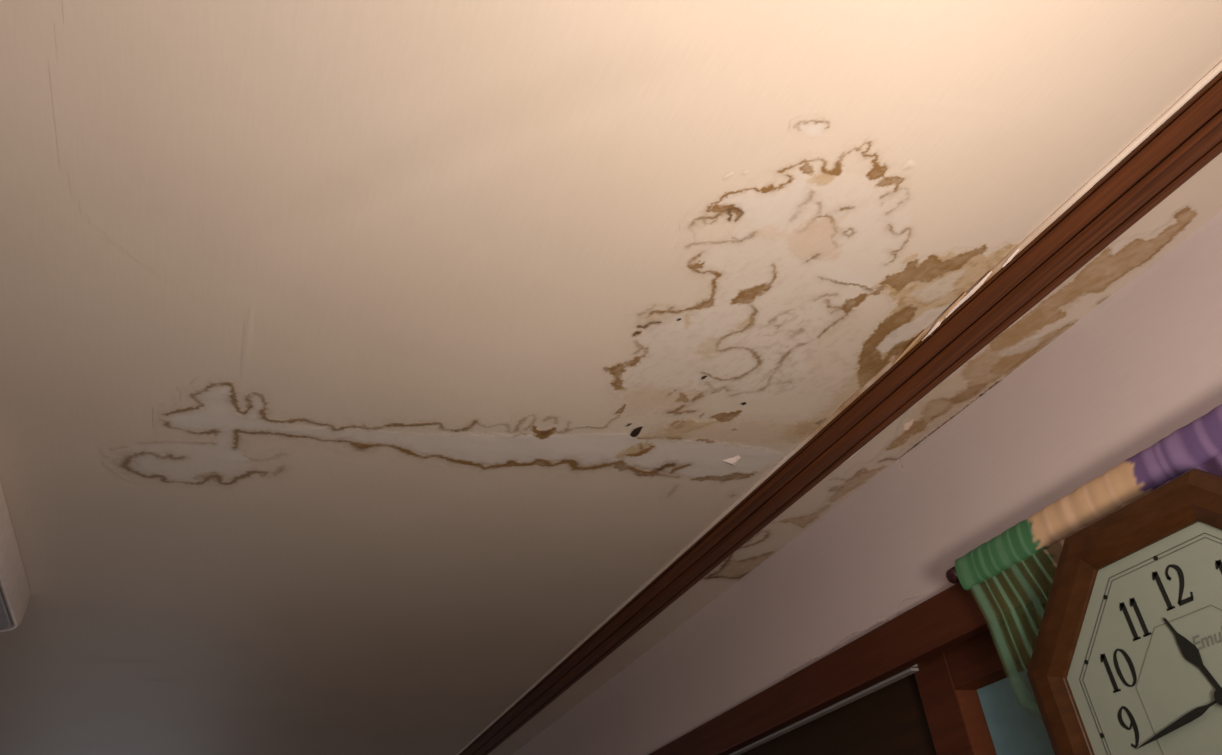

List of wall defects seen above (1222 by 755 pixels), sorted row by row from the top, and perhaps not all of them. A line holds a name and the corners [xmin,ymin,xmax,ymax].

water stain [98,112,1026,503]
water stain [700,204,1200,583]